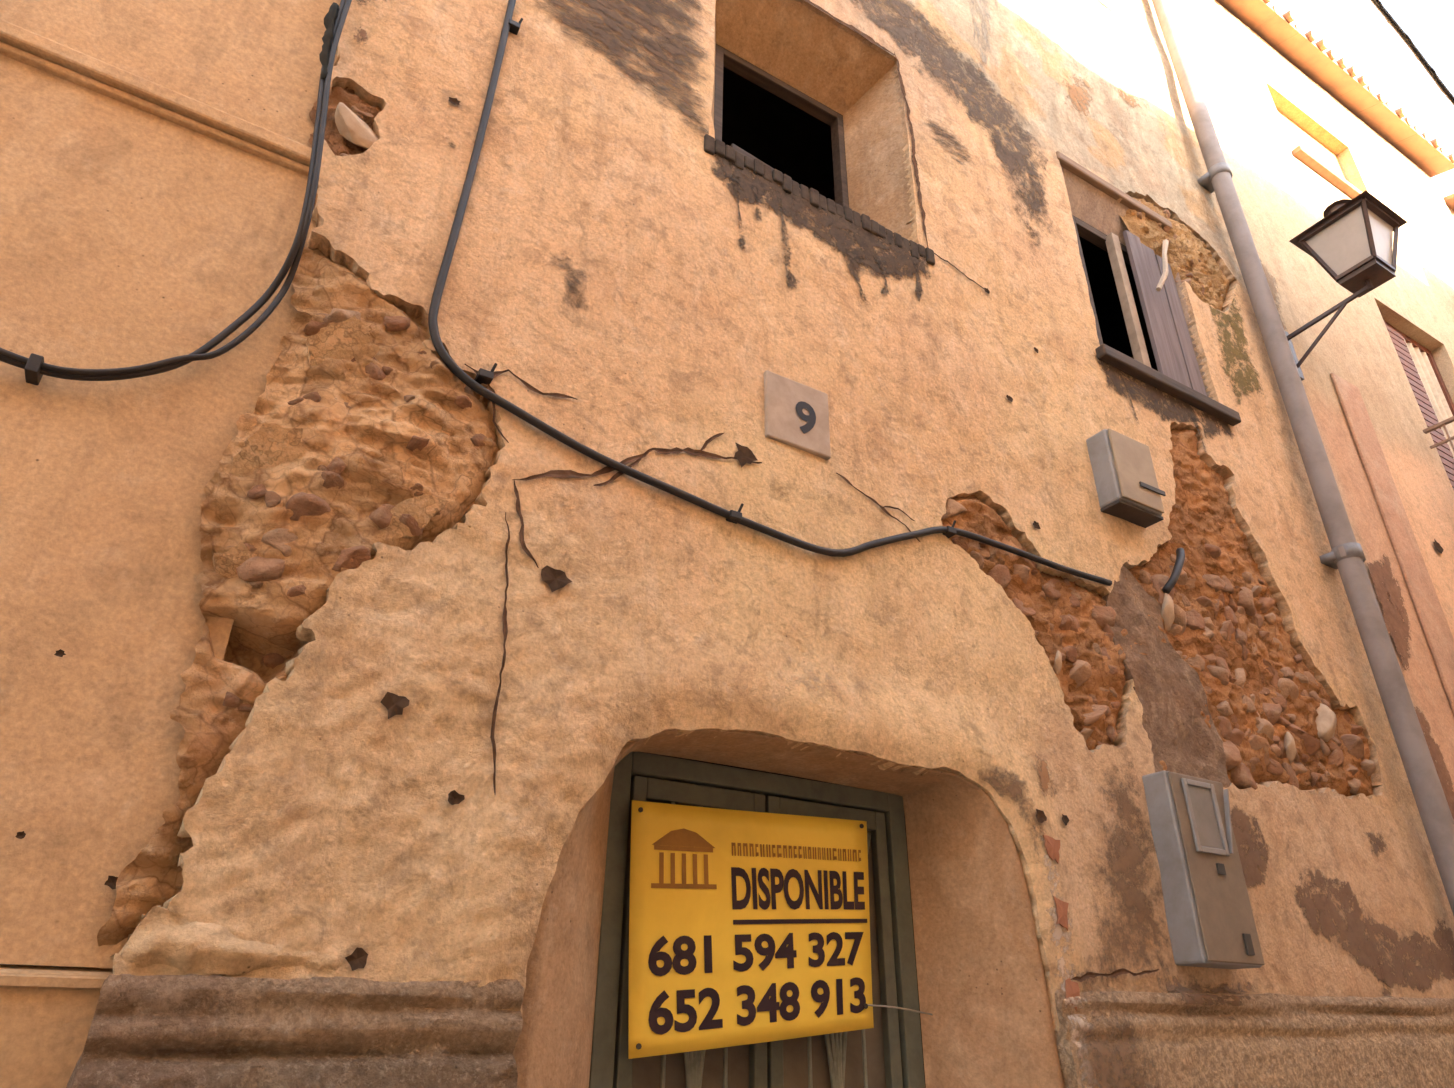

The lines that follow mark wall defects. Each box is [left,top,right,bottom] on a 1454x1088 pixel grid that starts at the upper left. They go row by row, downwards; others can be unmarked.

spalling [308,86,382,156]
water stain [547,0,709,134]
water stain [855,0,1051,246]
water stain [711,154,931,303]
spalling [1120,197,1229,311]
crack [465,364,576,443]
spalling [97,246,500,946]
crack [490,433,762,793]
spalling [941,495,1147,750]
spalling [1125,428,1376,797]
flaking render [1035,756,1057,797]
water stain [1294,868,1454,999]